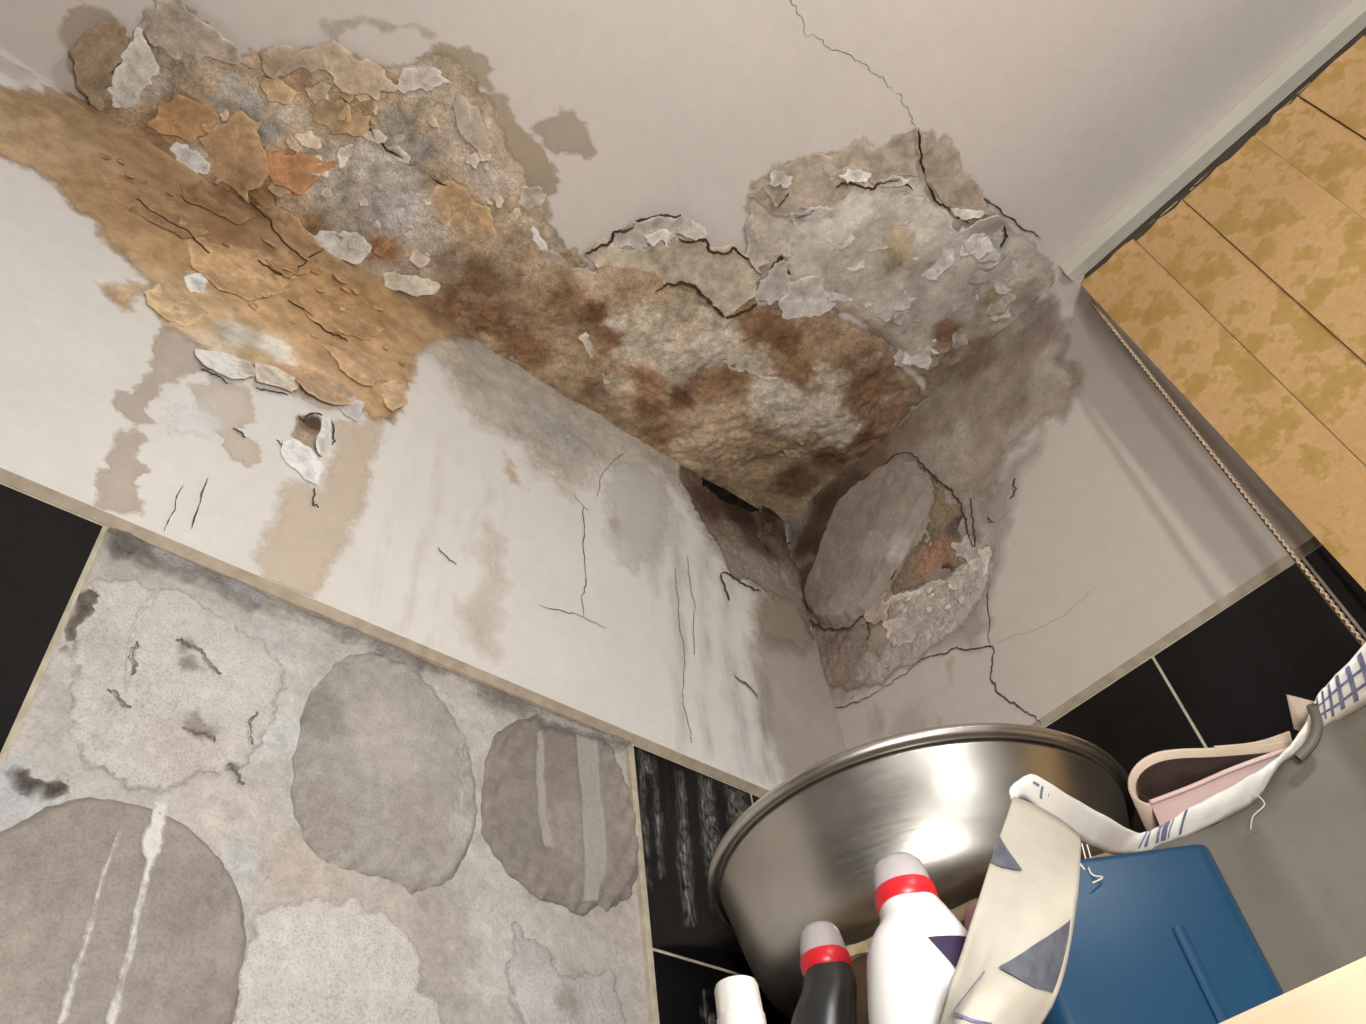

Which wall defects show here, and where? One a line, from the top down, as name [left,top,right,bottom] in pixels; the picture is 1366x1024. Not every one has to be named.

damp [66,7,115,28]
crack [790,0,917,128]
peeling [69,0,1054,523]
damp [0,86,722,597]
spalling [66,578,286,793]
spalling [112,529,441,672]
spalling [462,678,631,745]
crack [538,453,625,628]
crack [809,570,897,640]
spalling [812,535,992,692]
crack [843,452,1017,547]
crack [835,576,1100,724]